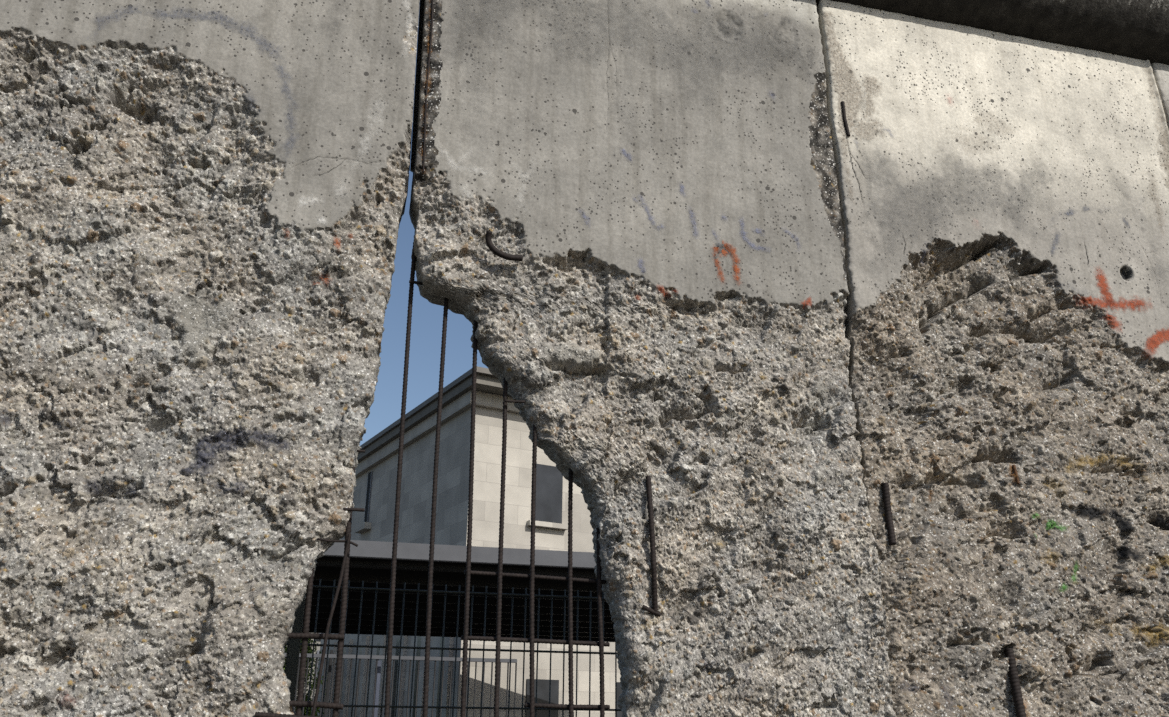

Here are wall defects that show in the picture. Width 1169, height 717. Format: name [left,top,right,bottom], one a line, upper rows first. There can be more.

spalling [0,0,432,717]
spalling [409,0,1169,717]